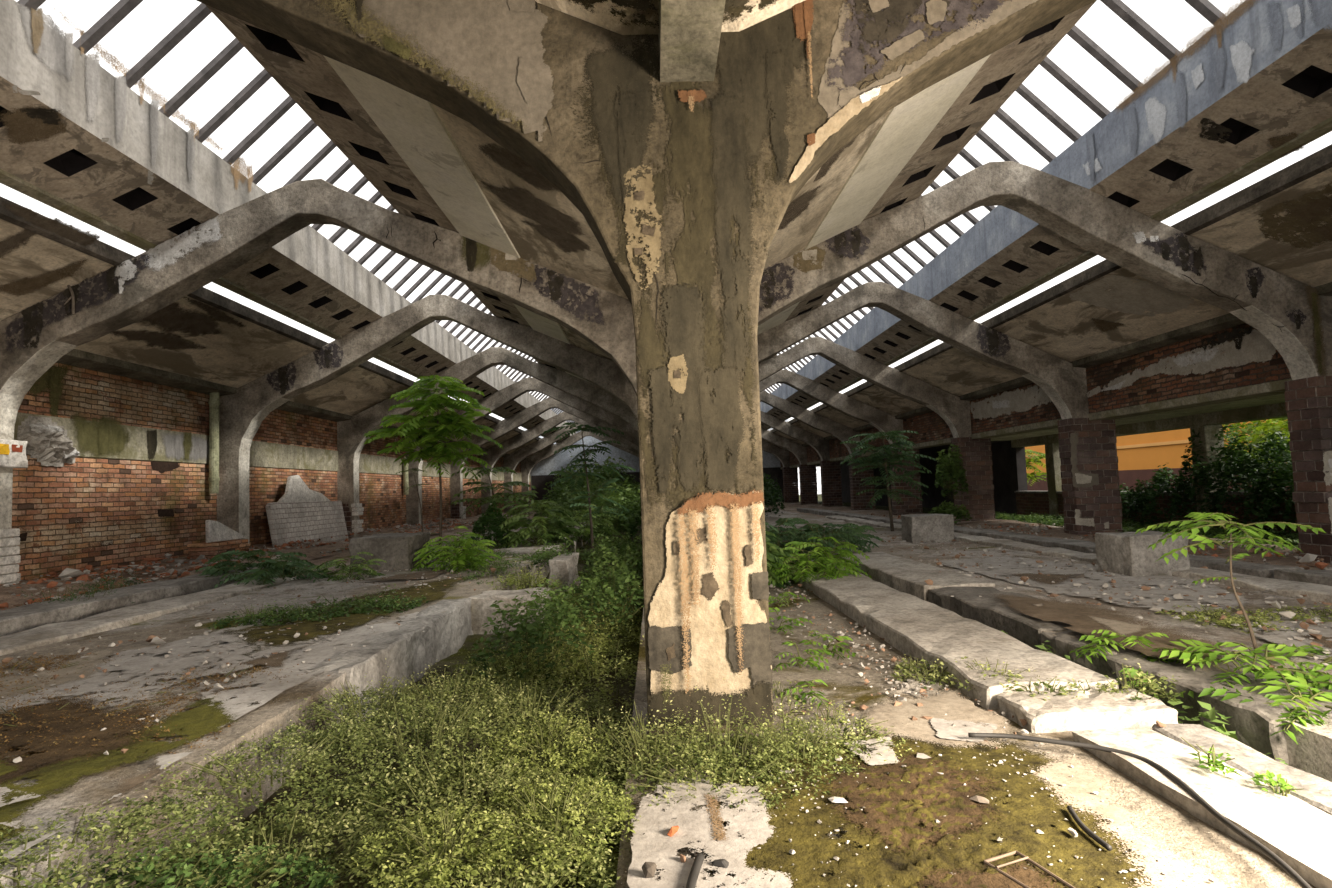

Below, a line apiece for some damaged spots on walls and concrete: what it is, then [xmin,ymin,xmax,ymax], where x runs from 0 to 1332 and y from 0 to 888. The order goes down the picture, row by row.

corrosion [791,0,814,97]
flaking render [789,0,1038,183]
water stain [475,142,595,255]
water stain [533,265,605,325]
flaking render [623,165,663,290]
water stain [568,0,871,518]
flaking render [667,354,688,394]
flaking render [1086,329,1276,397]
flaking render [1323,450,1332,533]
spalling [648,491,773,724]
corrosion [675,489,764,696]